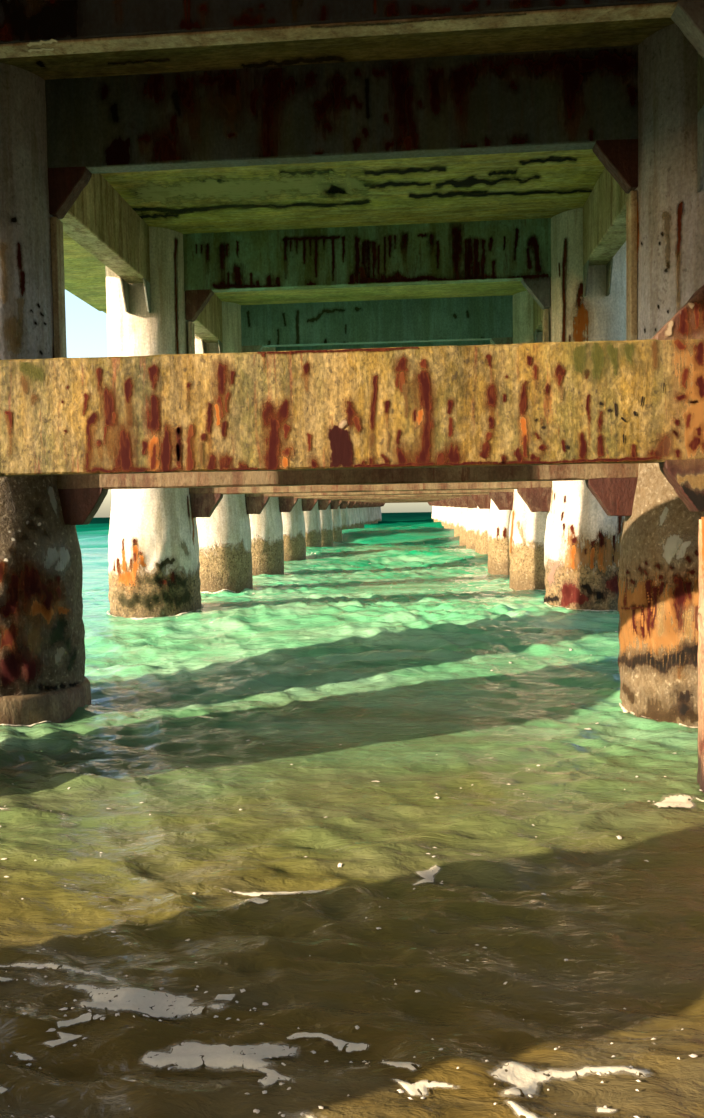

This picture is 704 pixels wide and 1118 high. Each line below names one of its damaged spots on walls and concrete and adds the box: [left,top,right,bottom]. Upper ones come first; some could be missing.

rust [0,0,78,42]
rust [105,114,182,165]
rust [196,240,280,289]
rust [0,242,25,354]
rust [257,202,704,468]
rust [82,363,293,473]
rust [179,496,194,555]
rust [497,511,526,553]
rust [113,539,147,587]
rust [551,490,704,662]
rust [0,561,69,689]